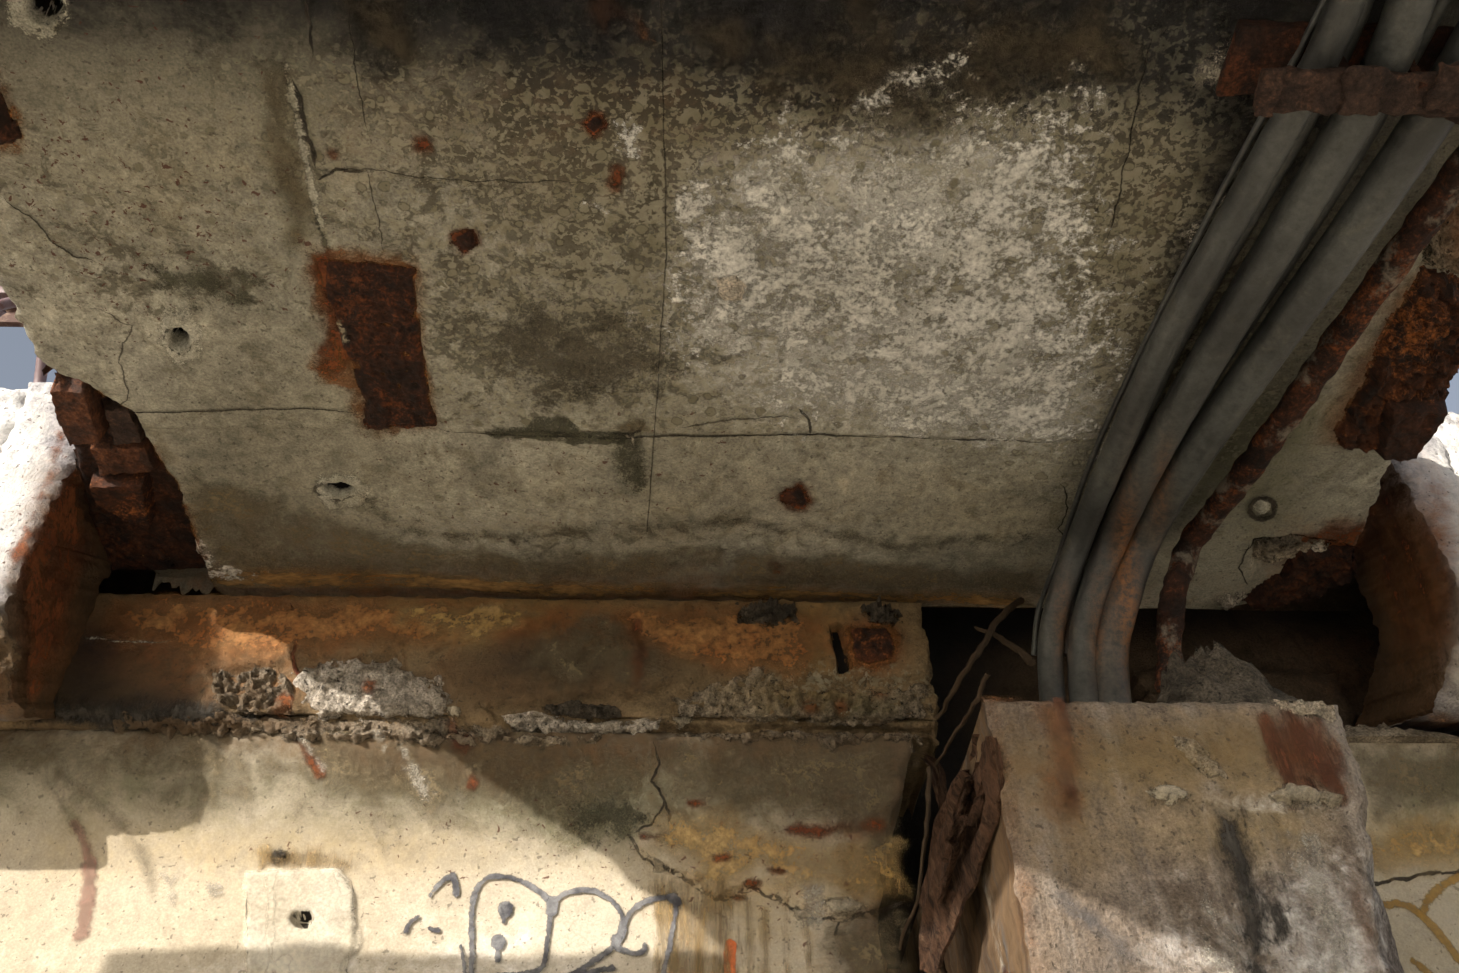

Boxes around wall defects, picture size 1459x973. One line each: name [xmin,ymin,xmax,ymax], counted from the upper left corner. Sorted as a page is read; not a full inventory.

water stain [345,0,644,71]
crack [281,0,585,252]
water stain [143,256,272,311]
water stain [437,0,1143,447]
crack [615,0,1063,532]
corrosion [302,246,437,436]
corrosion [10,427,1031,700]
spalling [1213,591,1248,611]
spalling [1252,534,1330,564]
spalling [112,658,934,752]
corrosion [1261,711,1345,802]
crack [1374,869,1459,886]